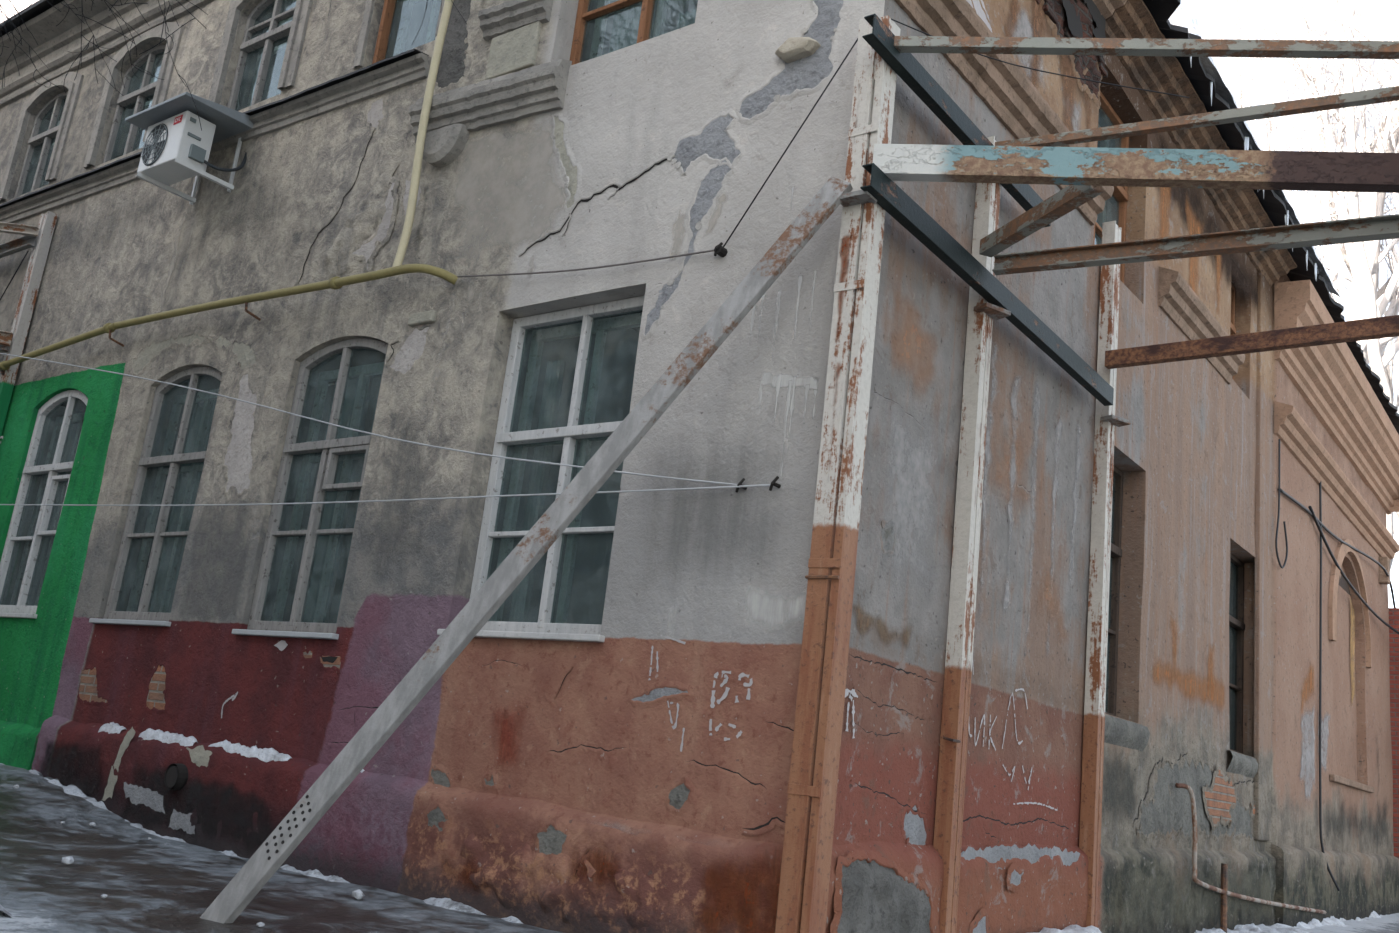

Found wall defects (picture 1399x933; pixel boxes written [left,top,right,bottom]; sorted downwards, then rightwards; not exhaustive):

flaking render [1036,0,1106,38]
flaking render [1067,55,1108,109]
flaking render [640,0,849,342]
crack [519,155,676,257]
corrosion [1187,206,1201,235]
corrosion [837,236,851,339]
flaking render [77,663,110,707]
flaking render [143,660,169,715]
flaking render [102,726,195,834]
flaking render [187,745,212,767]
flaking render [830,850,934,933]
flaking render [961,843,1080,893]